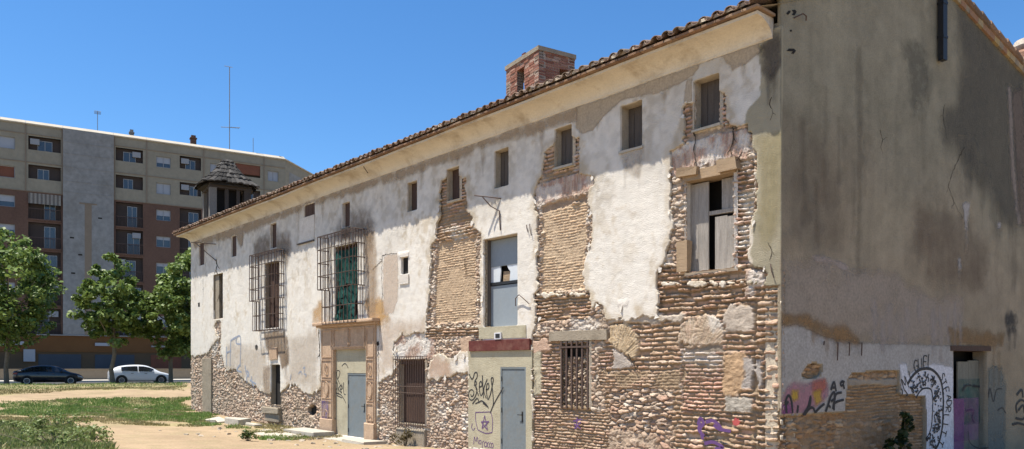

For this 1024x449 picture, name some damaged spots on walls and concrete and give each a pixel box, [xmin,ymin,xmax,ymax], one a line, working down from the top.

spalling [190,318,321,429]
spalling [378,173,491,449]
spalling [532,43,923,449]
water stain [946,16,1024,228]